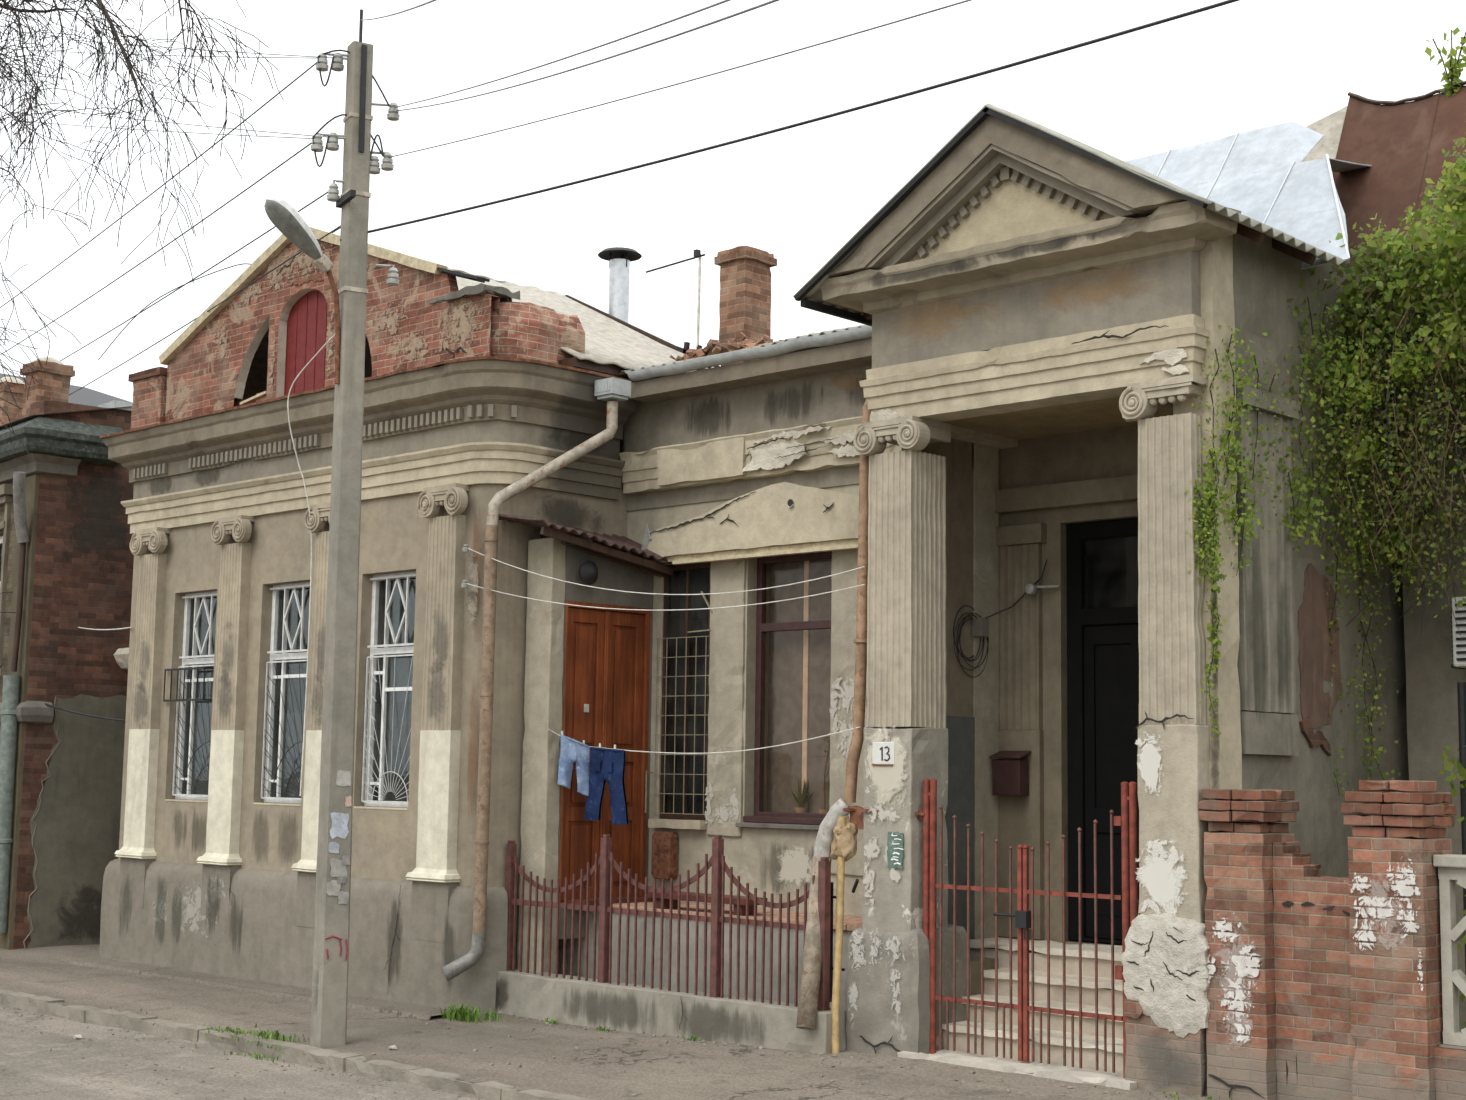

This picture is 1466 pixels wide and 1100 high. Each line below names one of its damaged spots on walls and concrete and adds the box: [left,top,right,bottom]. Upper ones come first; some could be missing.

crack [1072,325,1169,344]
spalling [1139,348,1189,376]
spalling [742,409,906,472]
spalling [1297,563,1342,756]
peeling [829,677,907,905]
peeling [1135,732,1164,796]
damp [153,879,225,934]
peeling [1136,839,1187,915]
peeling [1351,857,1424,991]
damp [495,980,506,1008]
peeling [848,927,905,1020]
peeling [1207,913,1262,1043]